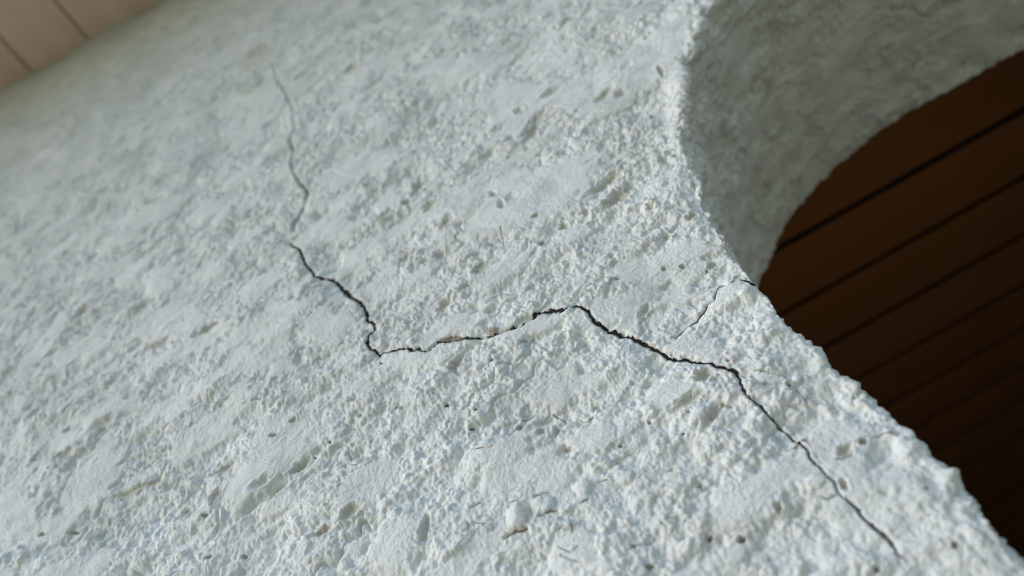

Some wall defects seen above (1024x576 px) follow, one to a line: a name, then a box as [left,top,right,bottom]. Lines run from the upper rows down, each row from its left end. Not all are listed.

crack [273,66,905,562]